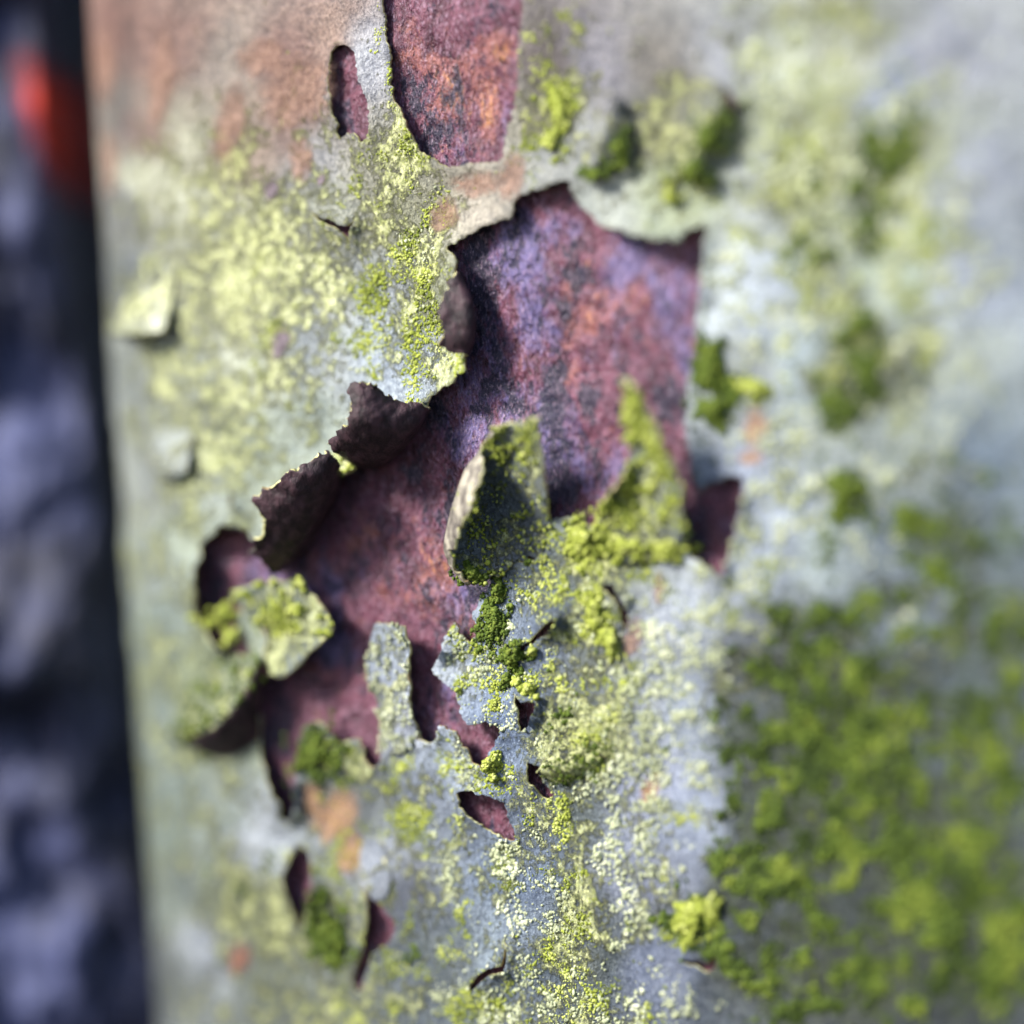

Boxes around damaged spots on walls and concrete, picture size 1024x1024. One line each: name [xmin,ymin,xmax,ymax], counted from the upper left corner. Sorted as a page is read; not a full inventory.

peeling [384,0,523,167]
peeling [167,180,744,822]
peeling [458,791,515,840]